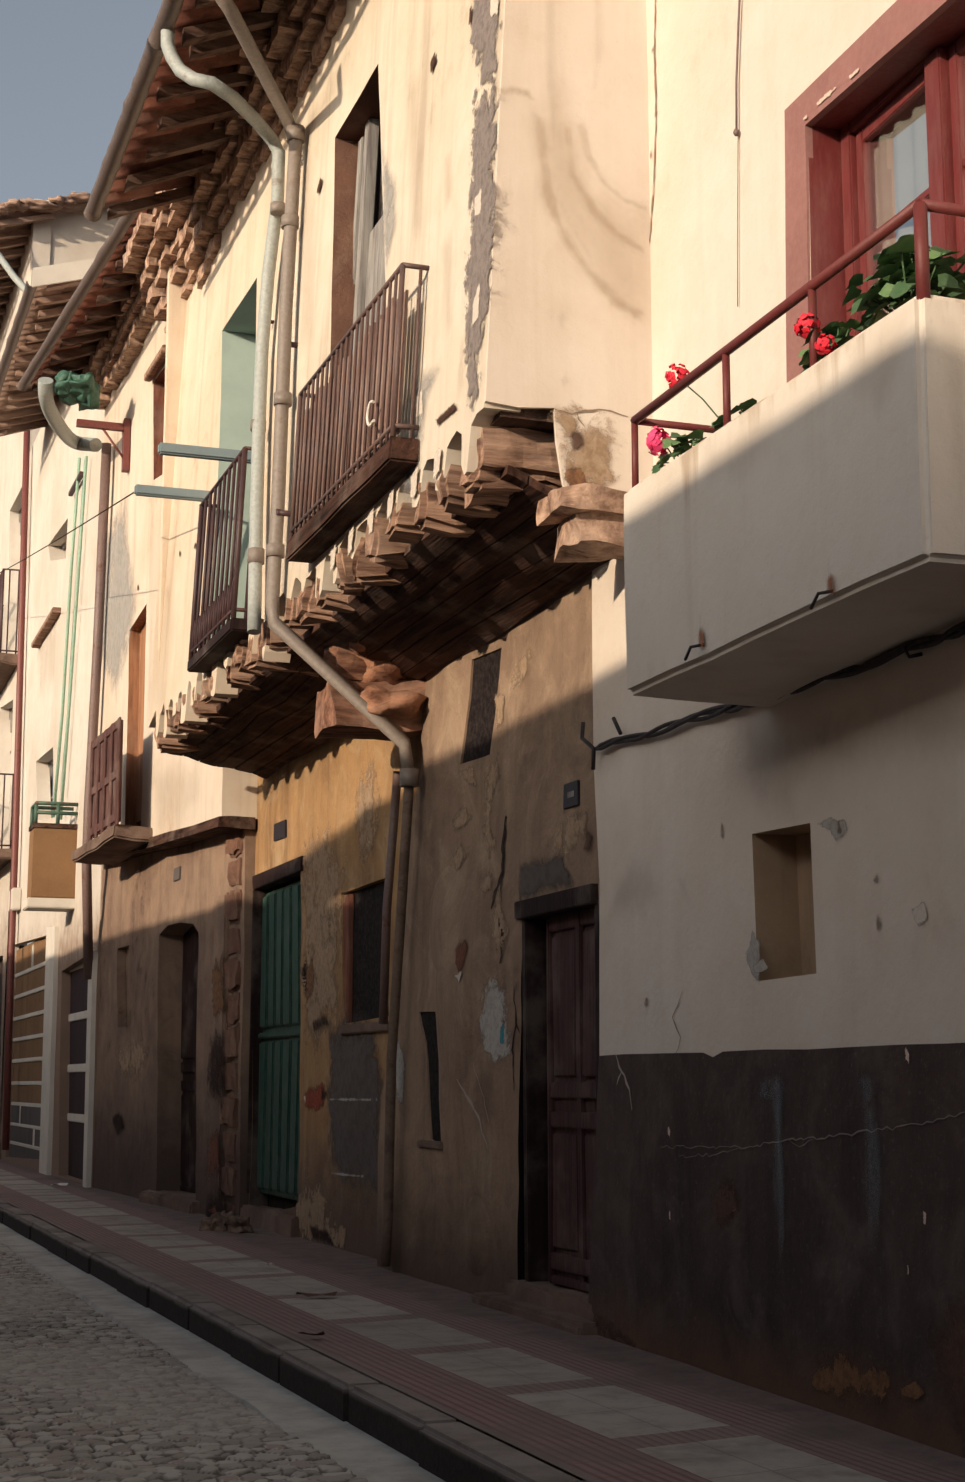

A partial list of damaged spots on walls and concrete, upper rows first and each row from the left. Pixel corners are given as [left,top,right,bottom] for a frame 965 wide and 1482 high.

peeling [437,0,502,426]
crack [664,1111,965,1158]
spalling [812,1351,925,1404]